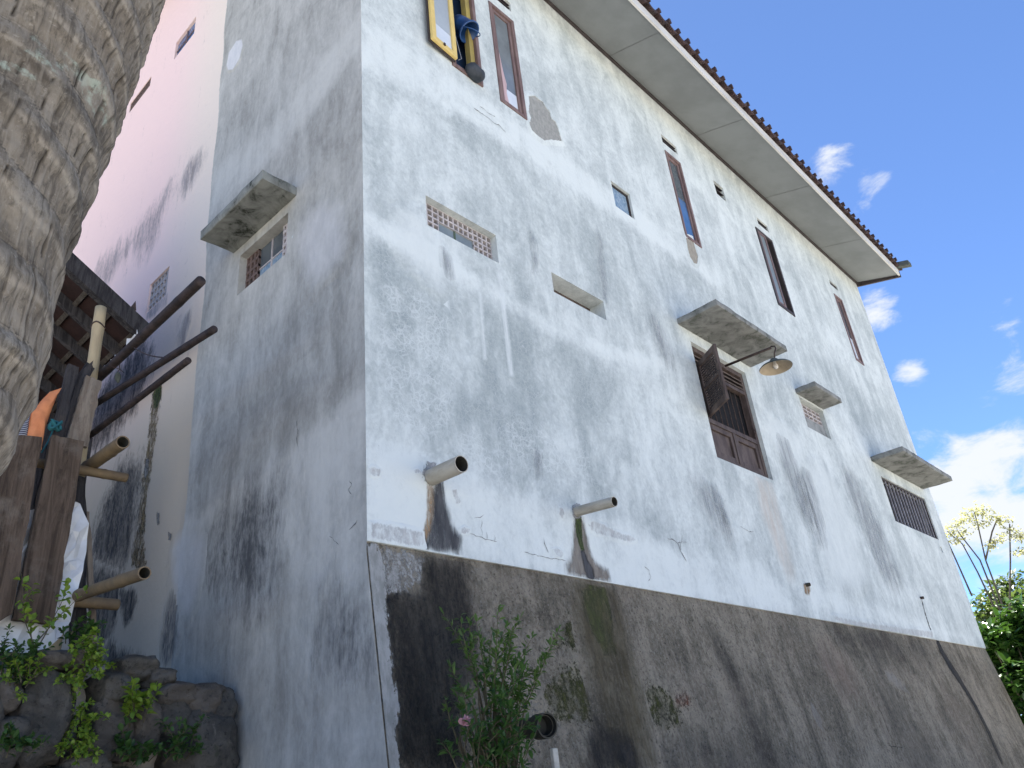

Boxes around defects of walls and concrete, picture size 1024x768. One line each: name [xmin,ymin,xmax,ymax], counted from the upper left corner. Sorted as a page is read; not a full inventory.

leakage [90,133,215,291]
flaking render [524,91,565,147]
flaking render [683,233,701,268]
crack [364,257,606,542]
leakage [197,430,381,723]
leakage [385,482,475,768]
leakage [561,516,670,768]